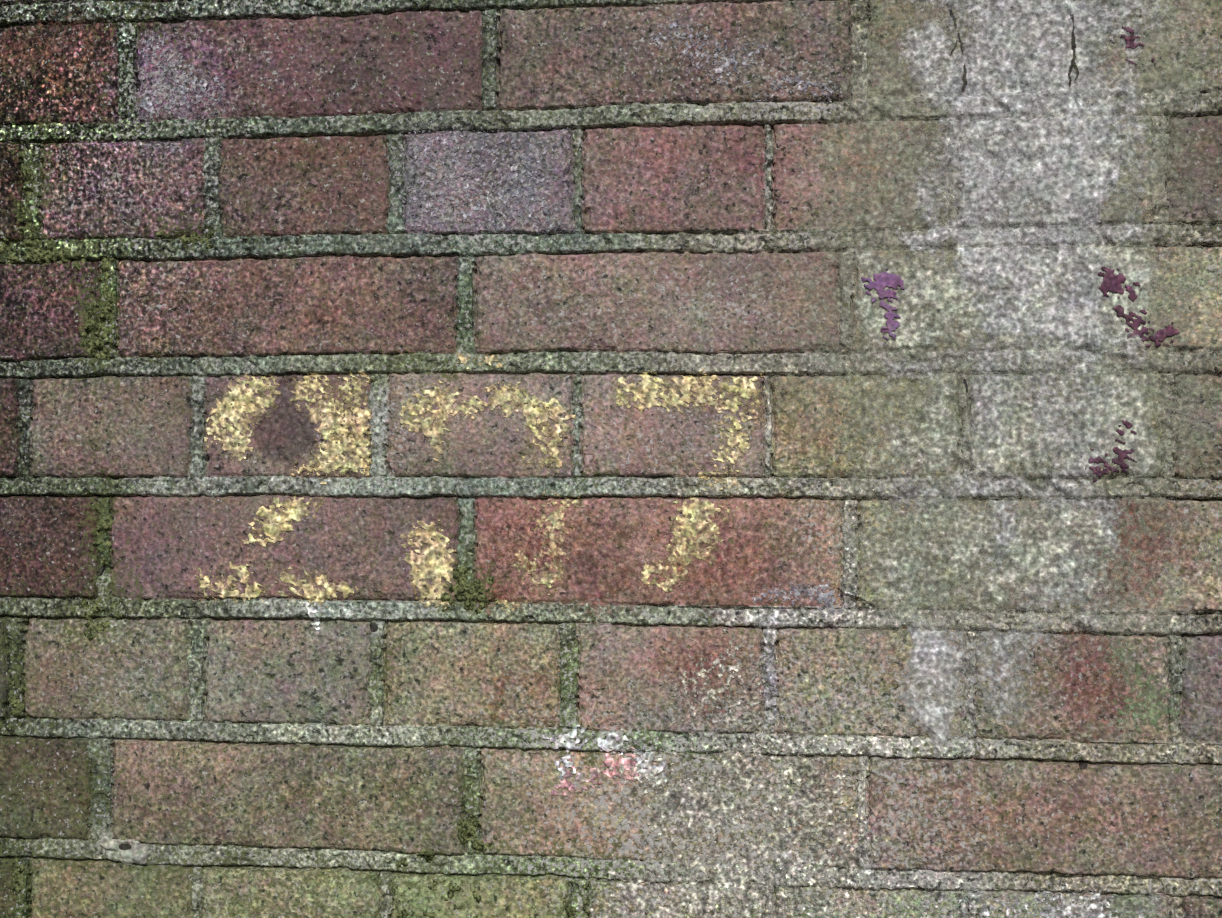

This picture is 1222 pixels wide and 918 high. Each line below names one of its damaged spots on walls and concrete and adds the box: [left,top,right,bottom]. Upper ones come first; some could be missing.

leakage [651,0,1207,744]
crack [1068,0,1079,88]